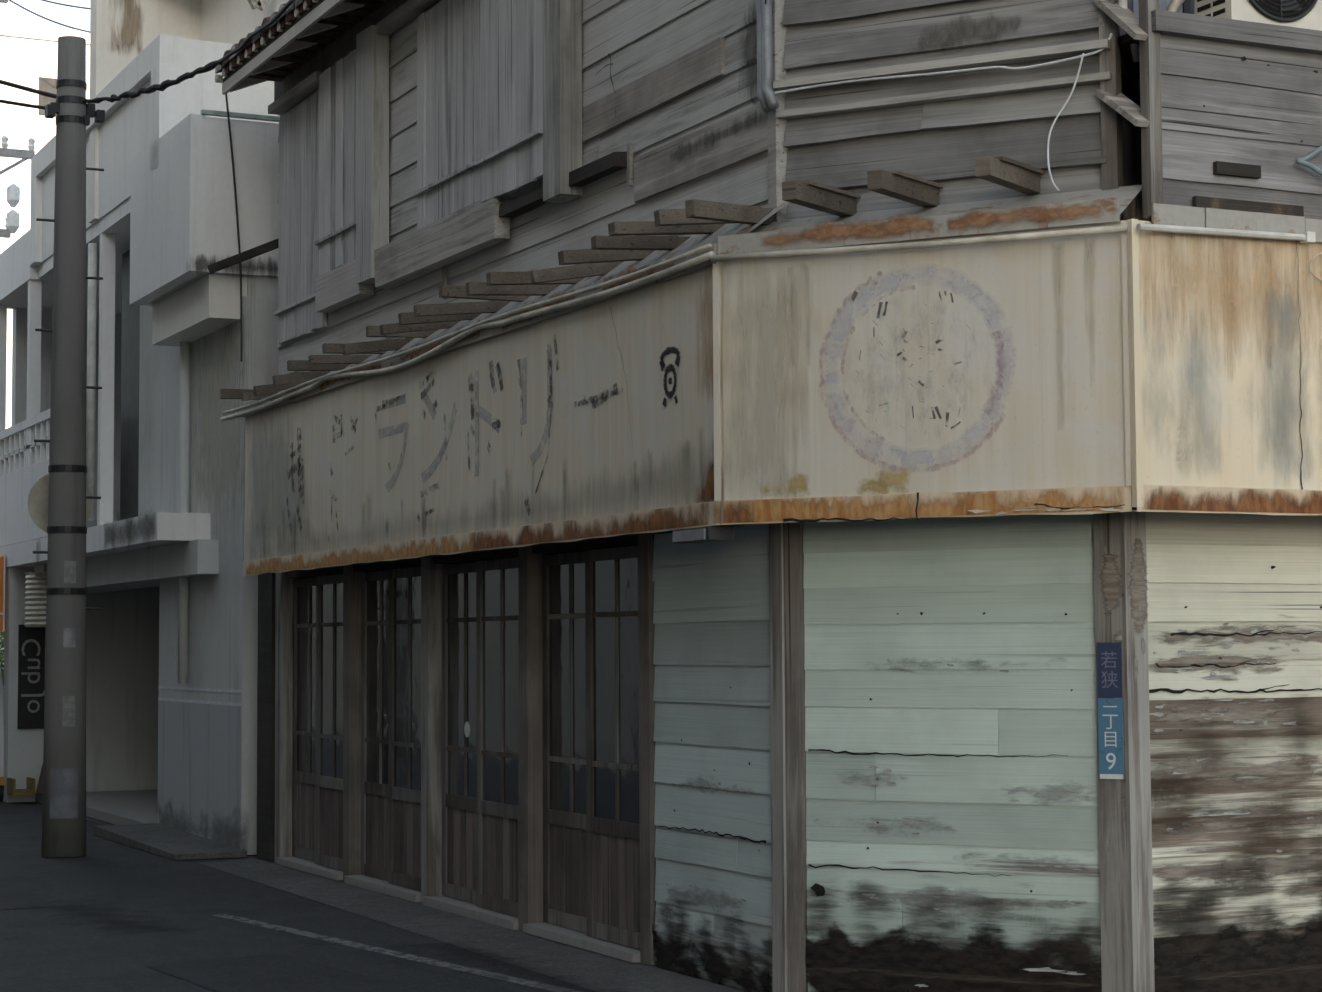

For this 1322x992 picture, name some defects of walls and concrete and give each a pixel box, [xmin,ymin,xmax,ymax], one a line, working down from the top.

corrosion [764,216,932,245]
corrosion [949,205,1101,229]
corrosion [246,464,1119,575]
corrosion [1147,489,1322,514]
peeling [1115,539,1322,683]
peeling [1149,698,1305,732]
water stain [652,899,773,992]
water stain [805,893,1102,992]
water stain [1154,866,1322,992]